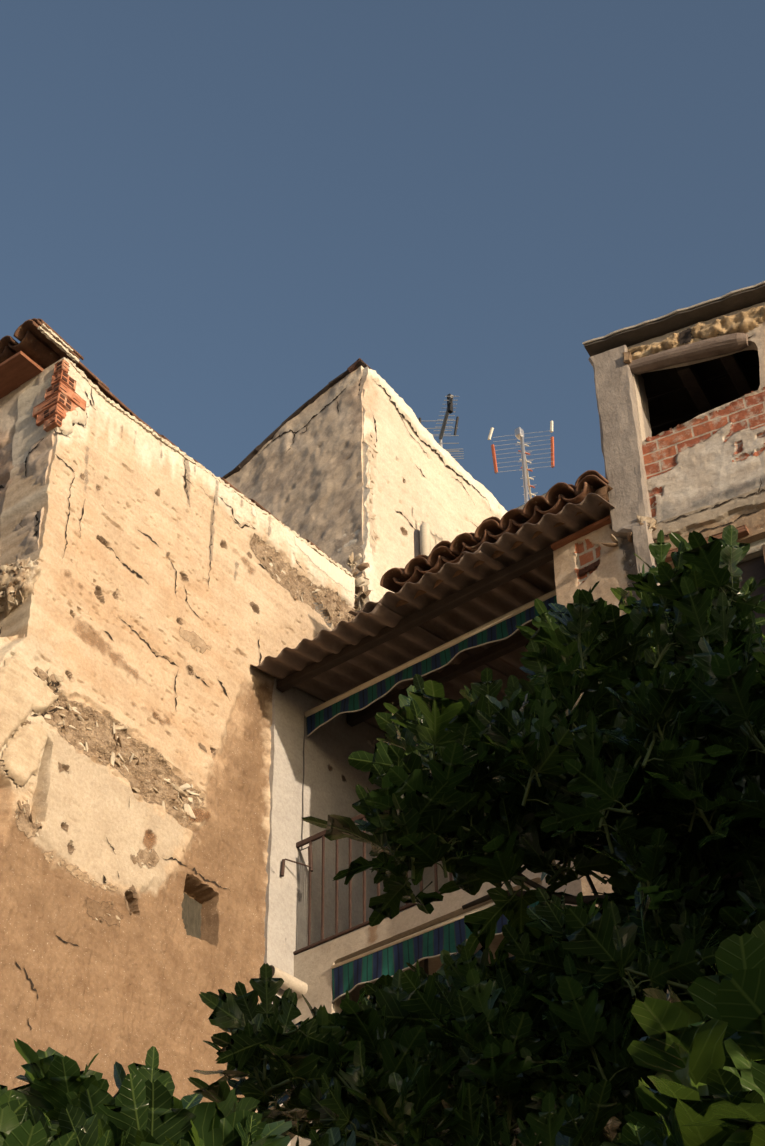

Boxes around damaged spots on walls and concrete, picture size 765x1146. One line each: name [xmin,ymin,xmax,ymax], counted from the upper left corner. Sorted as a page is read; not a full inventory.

spalling [33,359,86,432]
crack [0,391,96,559]
crack [107,547,148,584]
crack [138,459,255,620]
spalling [250,533,355,628]
crack [261,378,486,527]
spalling [574,539,601,585]
spalling [641,387,765,517]
crack [654,479,765,540]
spalling [0,651,204,838]
spalling [127,843,159,869]